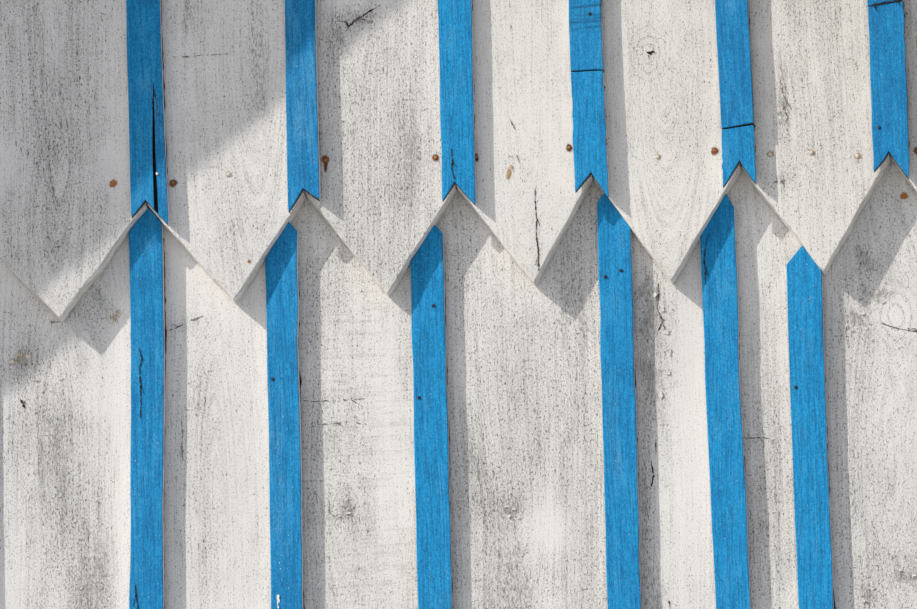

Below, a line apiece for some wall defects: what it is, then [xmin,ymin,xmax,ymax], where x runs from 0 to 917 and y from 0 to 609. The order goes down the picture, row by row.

crack [339,5,380,30]